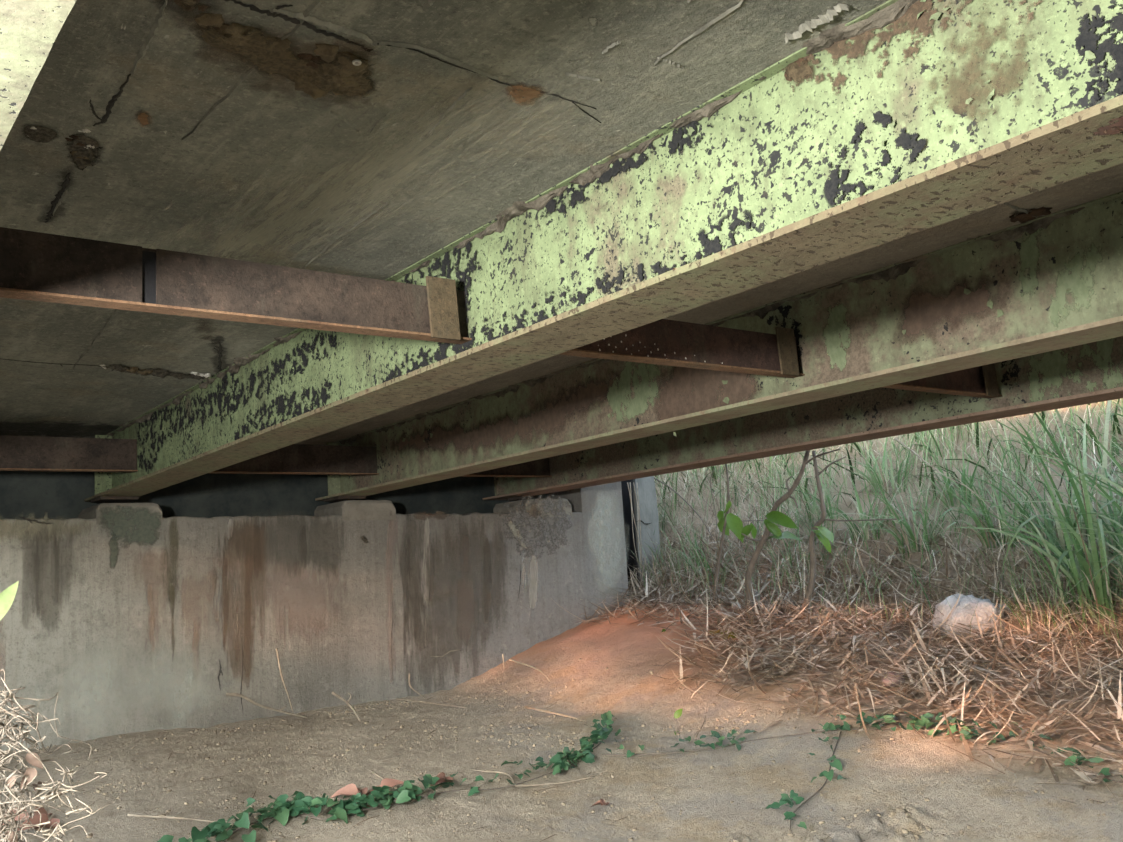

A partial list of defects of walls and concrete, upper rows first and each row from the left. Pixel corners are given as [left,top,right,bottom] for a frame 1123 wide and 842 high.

crack [89,0,168,126]
crack [224,0,512,86]
peeling [1066,4,1123,103]
spalling [23,125,102,171]
crack [539,91,601,123]
crack [43,172,71,223]
spalling [503,495,572,558]
leakage [166,521,178,653]